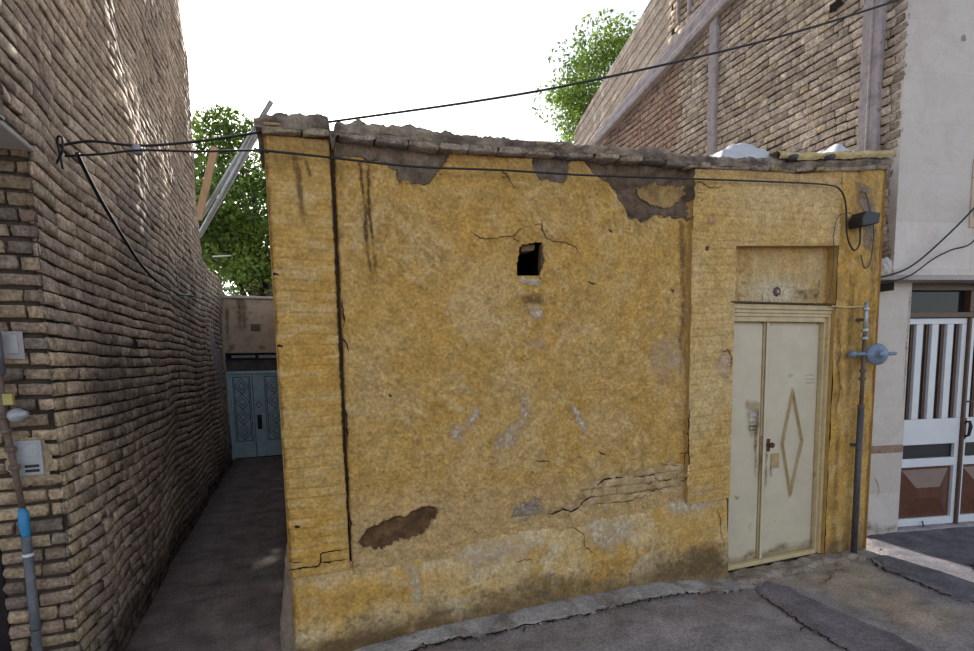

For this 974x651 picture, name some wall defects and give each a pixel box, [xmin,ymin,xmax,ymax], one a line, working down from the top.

water stain [359,162,376,267]
spalling [334,138,450,185]
spalling [533,157,570,183]
spalling [585,162,696,223]
crack [472,223,580,254]
crack [286,138,352,572]
spalling [359,506,441,552]
water stain [322,620,454,651]